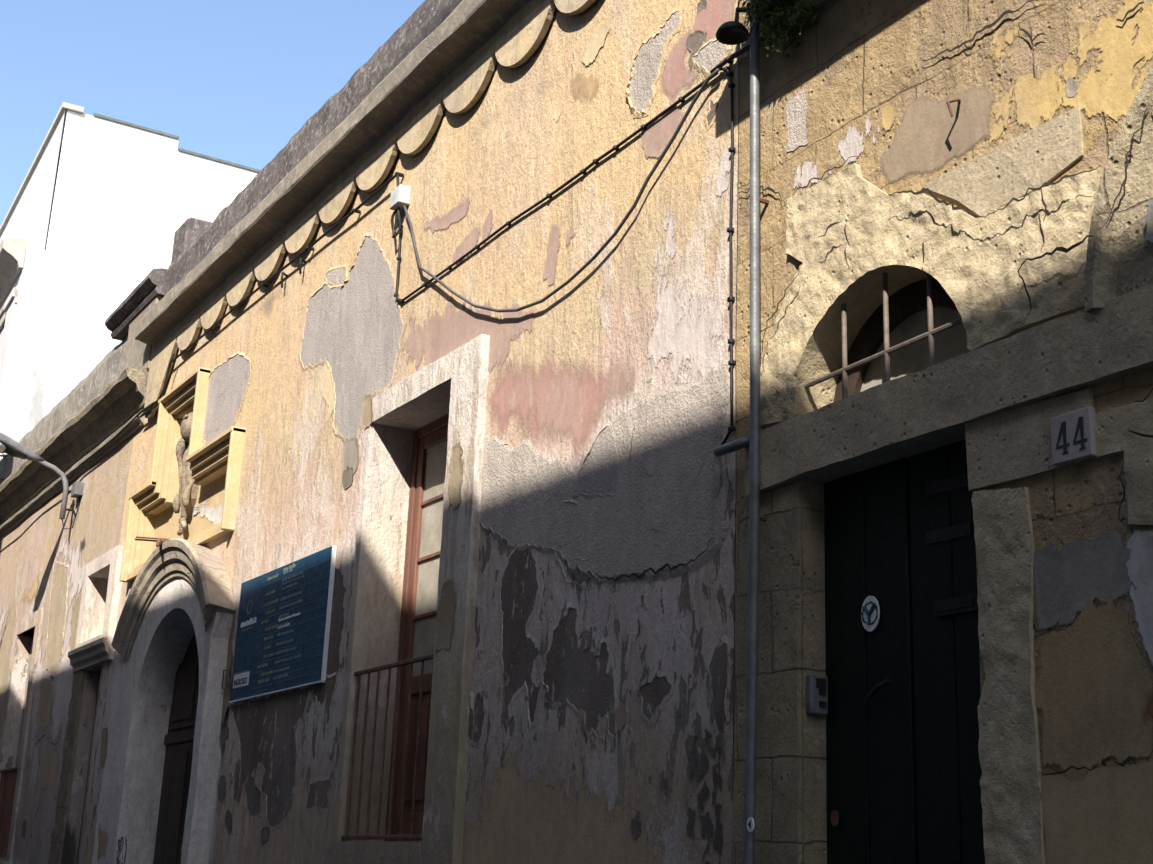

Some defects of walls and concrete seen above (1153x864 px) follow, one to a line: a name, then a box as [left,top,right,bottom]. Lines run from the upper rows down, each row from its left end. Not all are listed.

crack [923,0,1046,61]
crack [1117,2,1144,22]
spalling [626,0,735,158]
flaking render [784,105,898,201]
peeling [424,196,470,232]
peeling [452,209,492,263]
peeling [542,223,575,285]
damp [28,370,46,430]
flaking render [202,351,252,444]
flaking render [299,232,405,489]
flaking render [562,420,618,521]
flaking render [685,729,723,864]